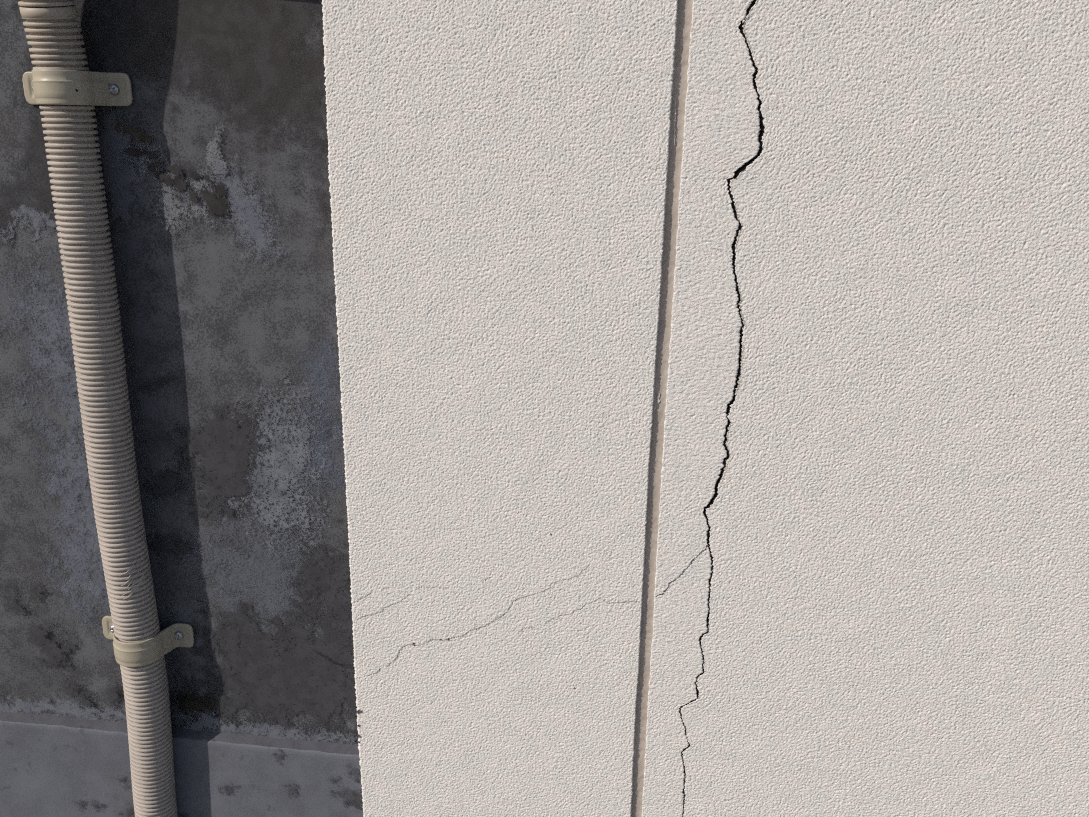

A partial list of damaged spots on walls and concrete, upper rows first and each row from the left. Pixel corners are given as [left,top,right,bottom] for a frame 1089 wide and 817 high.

leakage [0,101,111,668]
leakage [0,680,126,723]
leakage [95,106,142,223]
leakage [109,236,359,764]
crack [314,0,765,817]